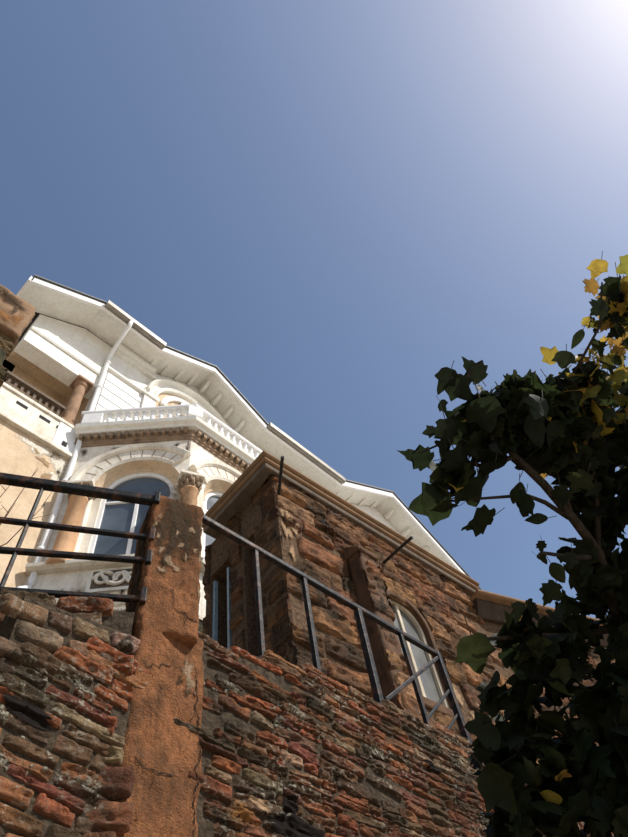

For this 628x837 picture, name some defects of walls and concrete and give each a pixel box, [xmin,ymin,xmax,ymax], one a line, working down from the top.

spalling [3,694,52,731]
crack [133,663,201,833]